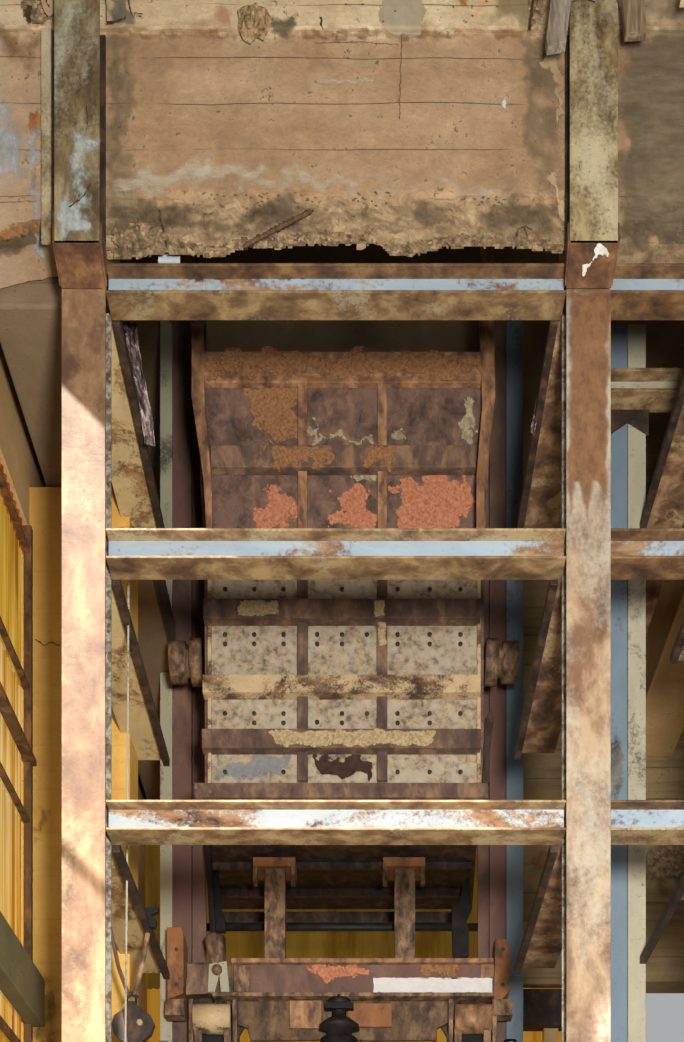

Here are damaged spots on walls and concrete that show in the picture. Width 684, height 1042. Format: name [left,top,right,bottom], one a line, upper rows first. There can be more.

spalling [21,0,53,23]
crack [318,17,402,119]
water stain [620,0,684,249]
water stain [116,160,228,230]
spalling [112,192,563,259]
peeling [582,243,609,276]
corrosion [306,965,370,983]